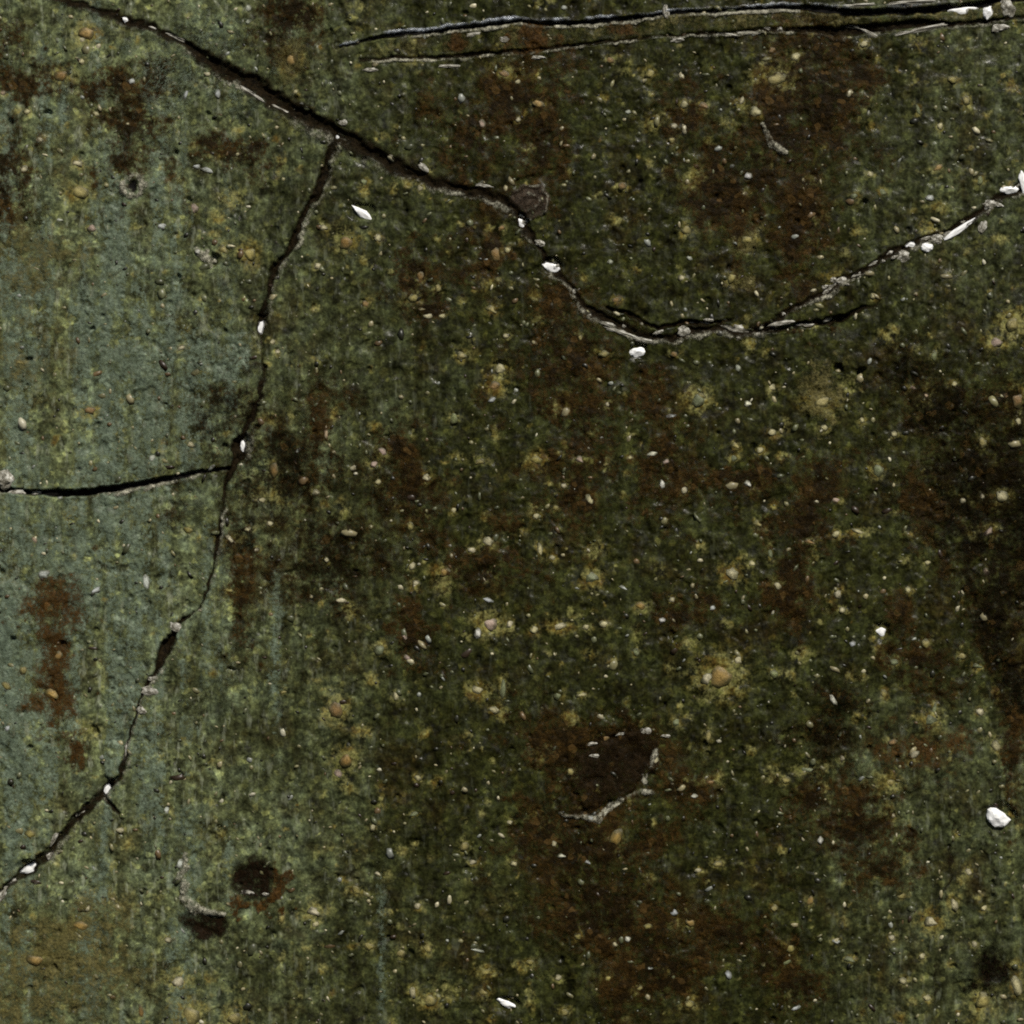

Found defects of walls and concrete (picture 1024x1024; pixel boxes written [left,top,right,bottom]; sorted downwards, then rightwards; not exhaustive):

crack [53,0,1024,358]
rust [17,573,86,769]
crack [0,363,266,902]
crack [943,814,955,898]